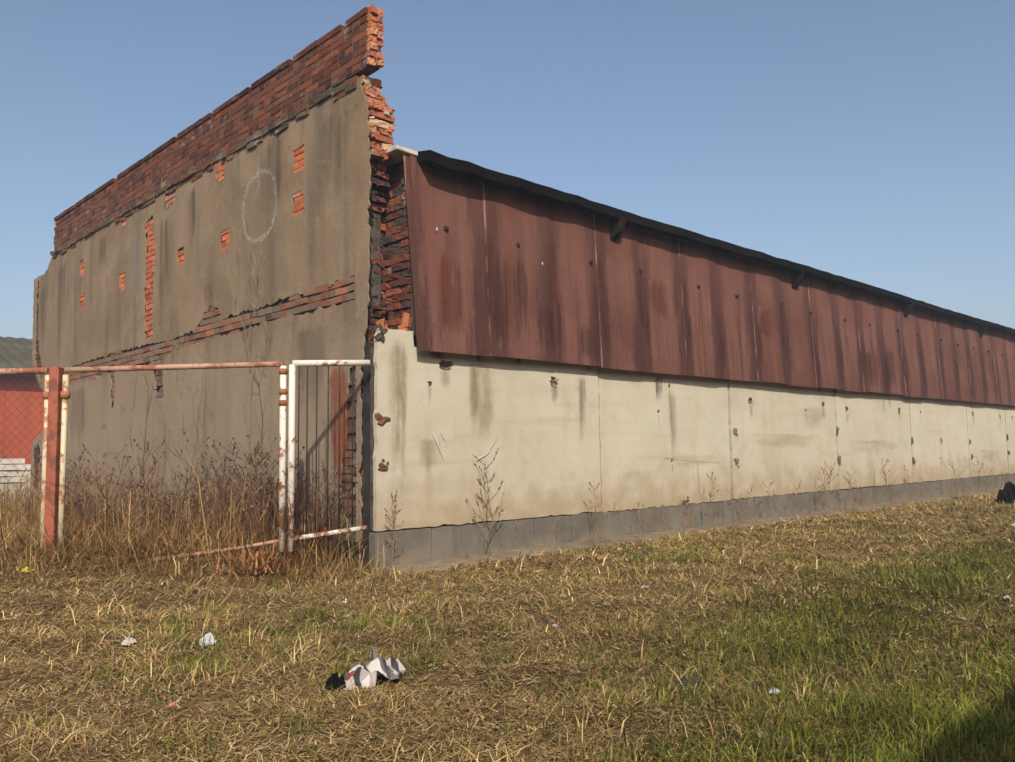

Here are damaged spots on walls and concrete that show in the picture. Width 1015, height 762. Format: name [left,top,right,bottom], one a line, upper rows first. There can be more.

flaking render [293,145,305,174]
flaking render [293,190,304,217]
spalling [374,312,412,343]